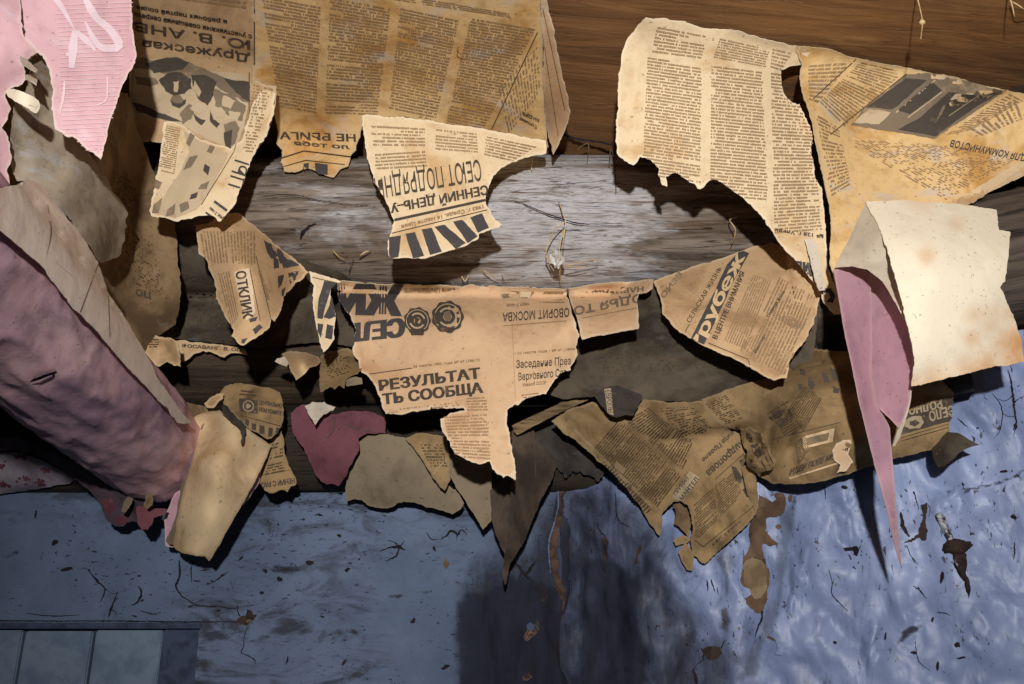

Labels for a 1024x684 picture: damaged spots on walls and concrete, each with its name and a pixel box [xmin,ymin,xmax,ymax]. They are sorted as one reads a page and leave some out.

peeling [5,56,40,114]
peeling [805,238,825,291]
damp [458,488,729,684]